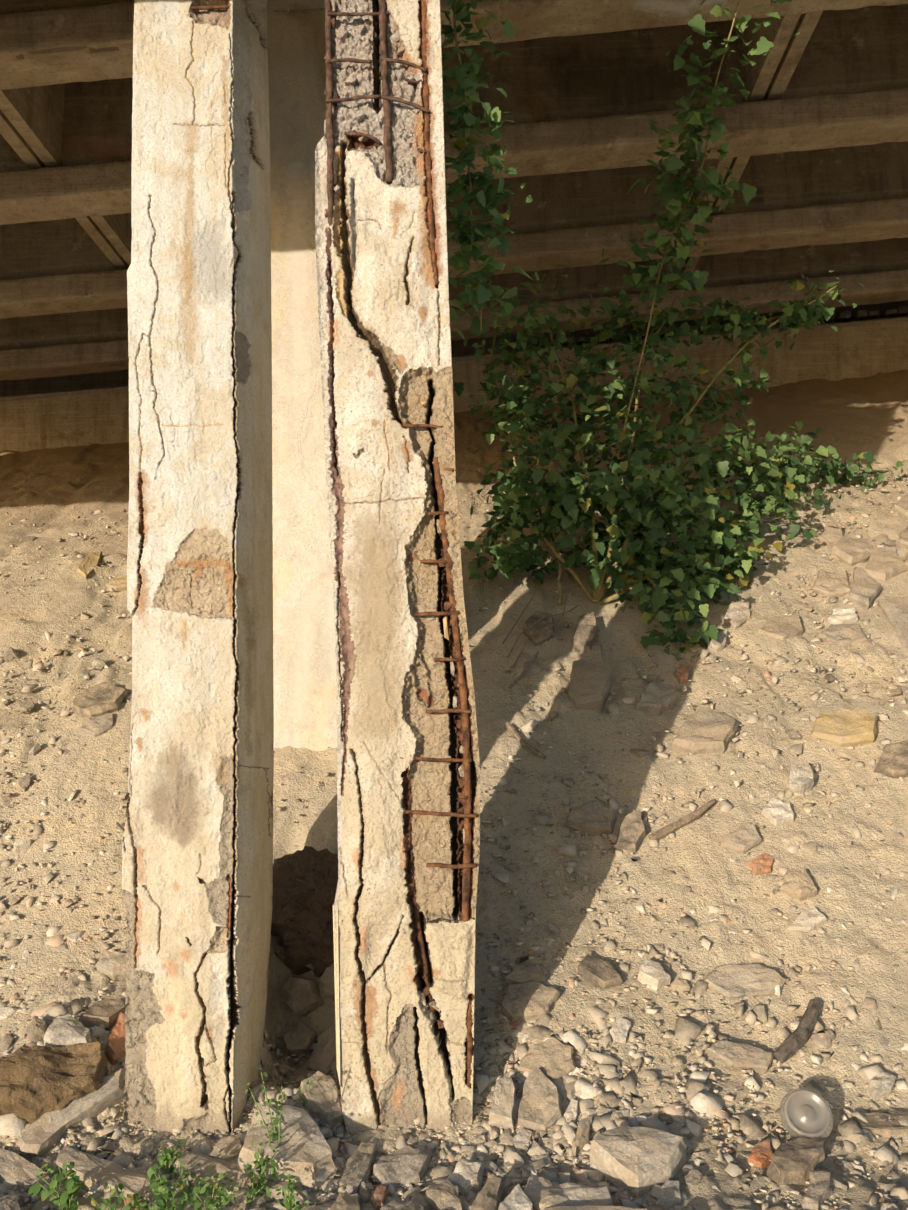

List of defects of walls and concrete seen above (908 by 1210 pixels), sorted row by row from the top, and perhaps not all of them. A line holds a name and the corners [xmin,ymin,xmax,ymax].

spalling [0,613,132,755]
spalling [62,506,124,597]
damp [154,754,195,844]
spalling [151,528,234,618]
crack [134,7,325,1124]
corrosion [325,227,358,796]
crack [339,740,400,1127]
spalling [323,0,424,188]
crack [335,140,420,524]
corrosion [403,0,441,366]
spalling [214,365,908,1210]